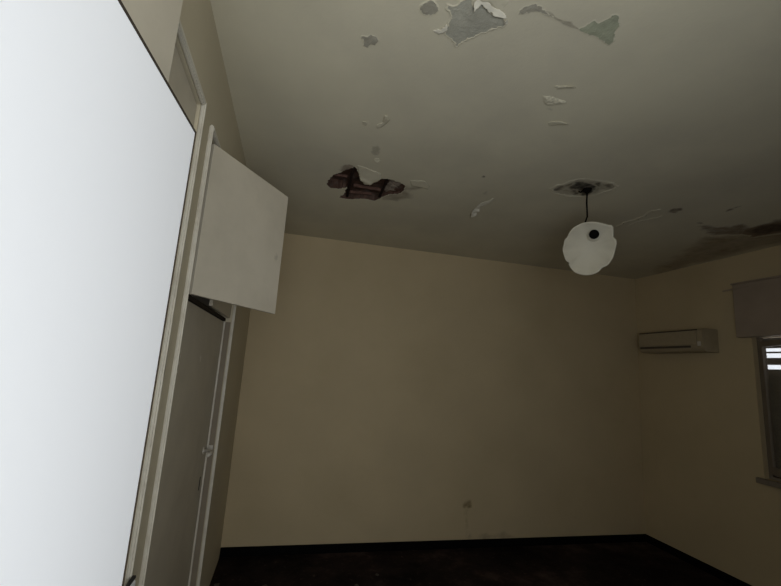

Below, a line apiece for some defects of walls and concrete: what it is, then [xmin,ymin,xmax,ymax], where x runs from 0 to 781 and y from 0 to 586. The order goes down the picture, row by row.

peeling [418,0,510,48]
peeling [577,13,621,46]
spalling [327,145,431,203]
damp [645,234,781,275]